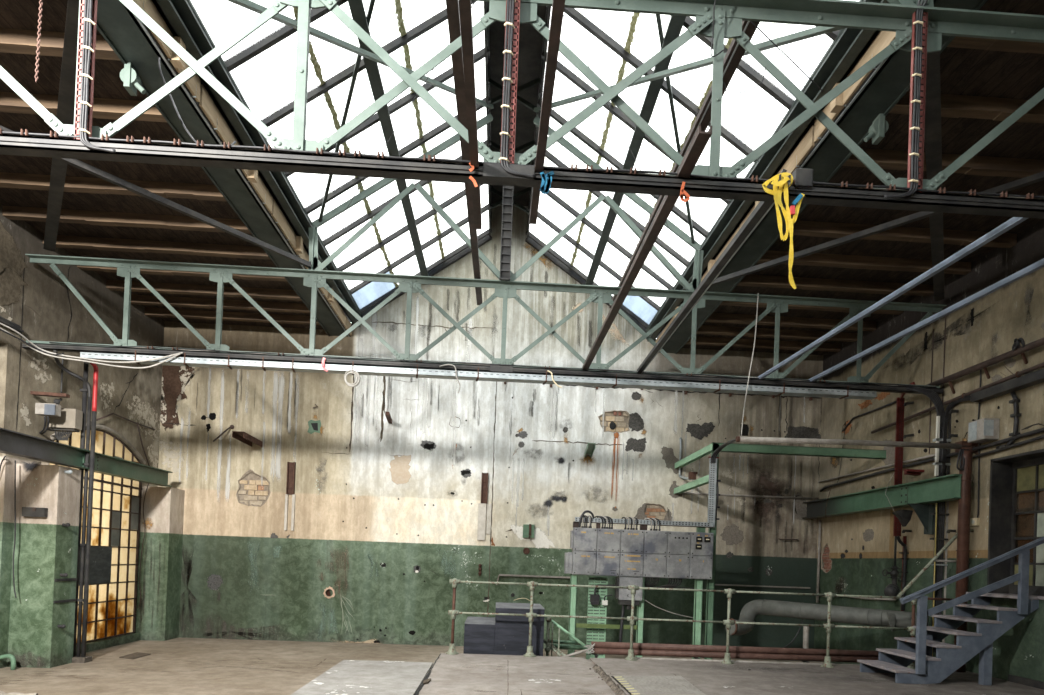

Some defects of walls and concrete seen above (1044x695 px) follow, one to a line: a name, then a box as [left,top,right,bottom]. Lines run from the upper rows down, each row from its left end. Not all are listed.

water stain [415,299,432,354]
spalling [236,469,271,507]
water stain [355,375,392,445]
spalling [420,440,436,453]
spalling [598,410,630,433]
rust [611,432,620,511]
spalling [644,503,668,521]
water stain [727,455,808,554]